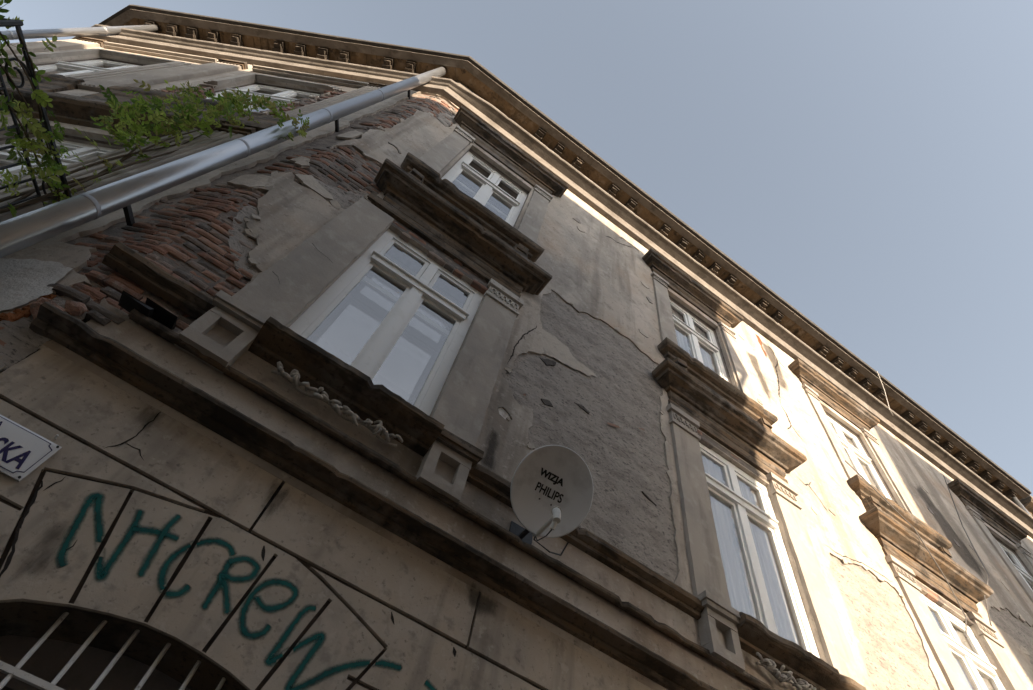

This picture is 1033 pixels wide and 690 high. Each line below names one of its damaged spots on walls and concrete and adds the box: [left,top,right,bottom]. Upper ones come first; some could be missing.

flaking render [260,89,347,116]
flaking render [0,94,458,371]
crack [103,412,161,459]
flaking render [504,291,678,582]
flaking render [829,554,938,690]
flaking render [915,579,974,627]
flaking render [988,608,1033,667]